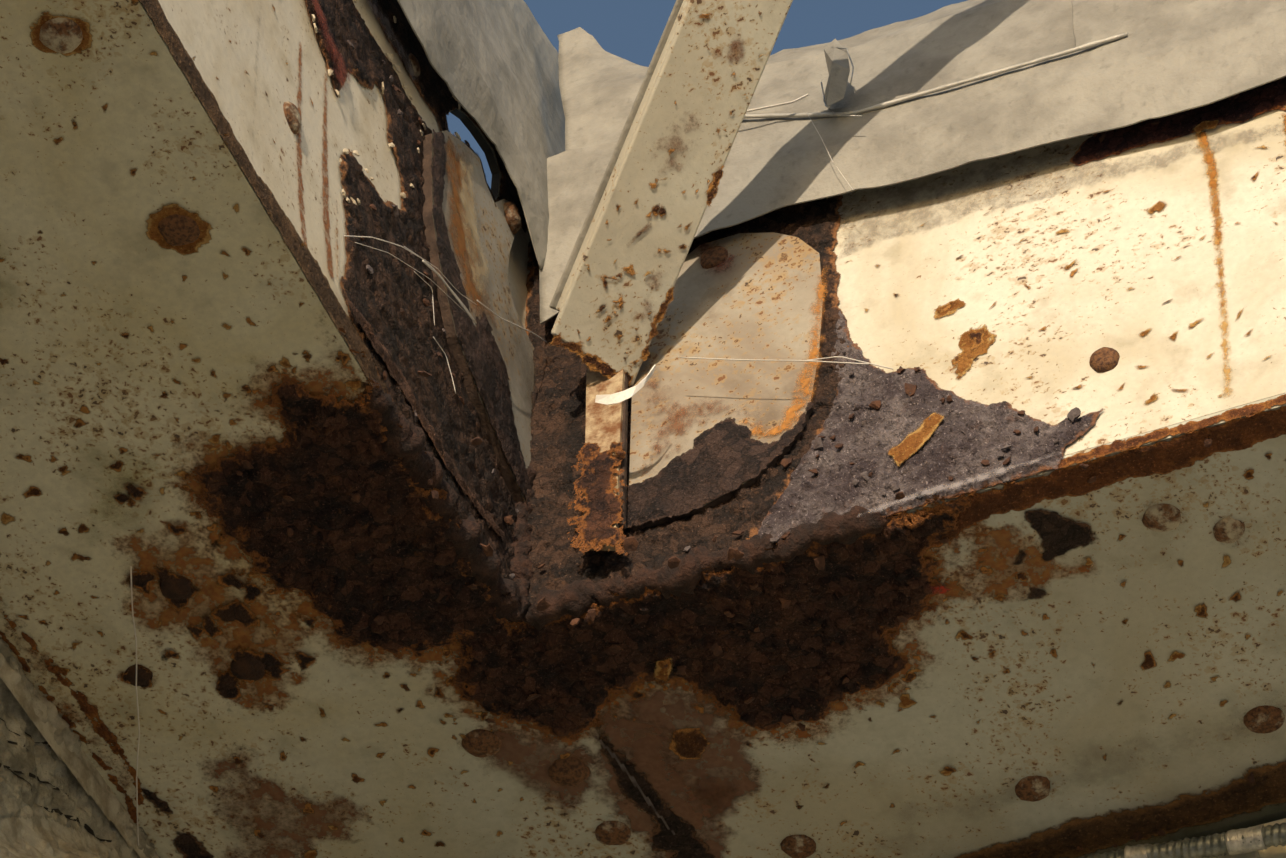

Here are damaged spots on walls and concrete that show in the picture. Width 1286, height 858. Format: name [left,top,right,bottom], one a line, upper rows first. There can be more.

rust [131,0,387,430]
peeling [305,0,528,580]
rust [549,259,674,386]
rust [682,165,724,206]
rust [934,298,966,319]
rust [951,324,997,380]
rust [1195,131,1243,397]
peeling [732,310,1103,543]
rust [113,394,1286,821]
peeling [930,509,1098,602]
crack [0,718,112,842]
rust [956,761,1286,858]